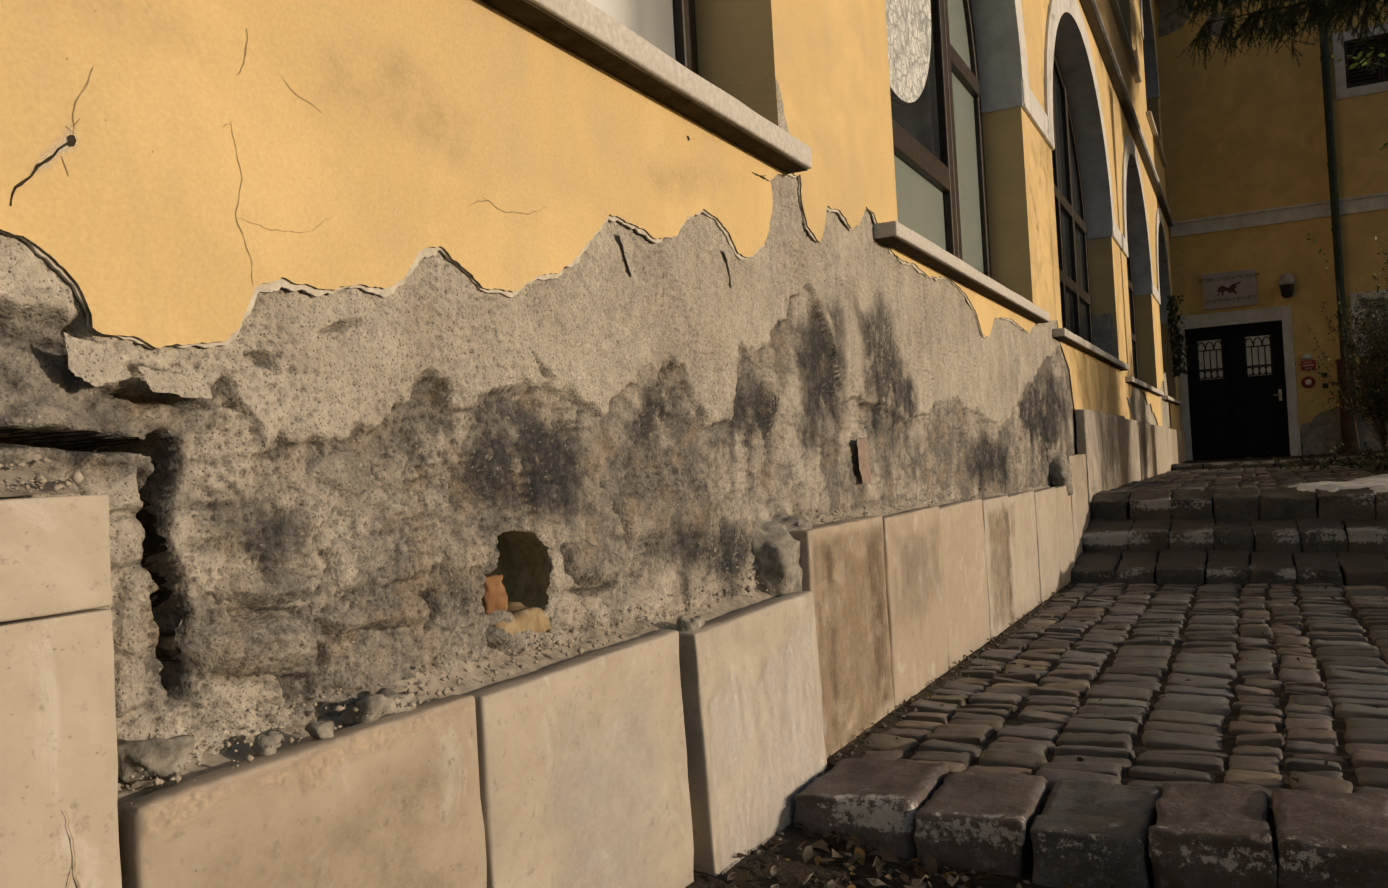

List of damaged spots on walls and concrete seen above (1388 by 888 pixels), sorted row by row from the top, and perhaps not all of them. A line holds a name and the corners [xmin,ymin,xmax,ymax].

crack [237,29,248,75]
crack [10,66,94,206]
crack [222,121,333,285]
damp [464,414,578,513]
flaking render [0,173,1077,764]
damp [637,373,667,436]
damp [731,388,778,436]
damp [801,309,845,444]
damp [863,300,917,429]
damp [973,440,1007,486]
damp [1020,378,1066,463]
damp [658,526,748,606]